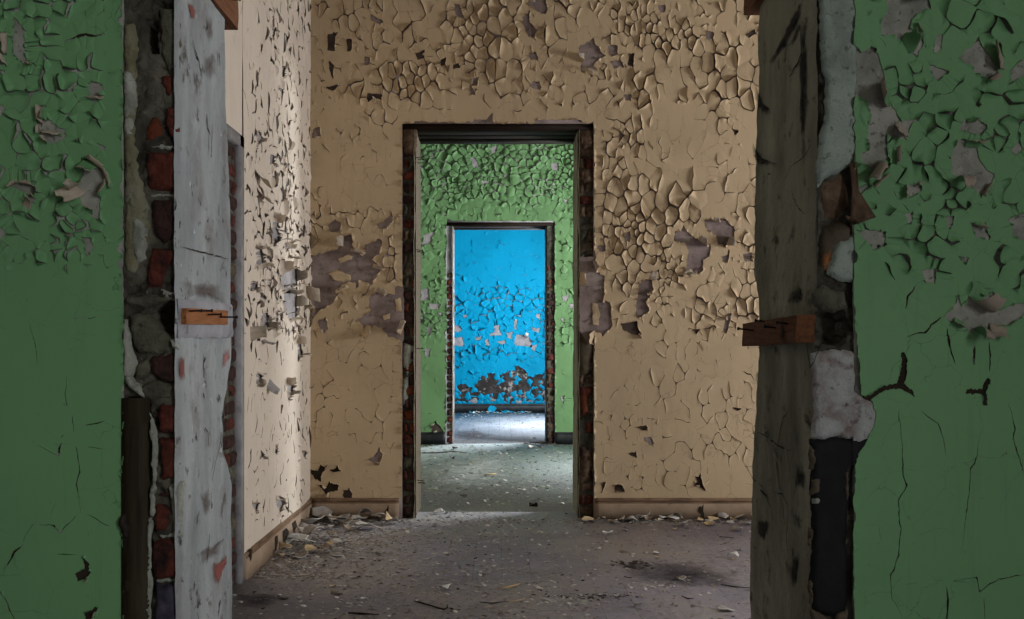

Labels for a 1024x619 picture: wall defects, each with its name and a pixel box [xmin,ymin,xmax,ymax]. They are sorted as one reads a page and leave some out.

peeling [326,32,352,91]
peeling [522,0,548,39]
peeling [578,39,634,76]
peeling [881,0,943,55]
peeling [959,39,1024,84]
peeling [951,116,994,198]
flaking render [55,0,186,619]
flaking render [248,124,754,526]
flaking render [807,0,917,619]
crack [862,317,991,405]
crack [7,391,109,566]
crack [875,449,907,610]